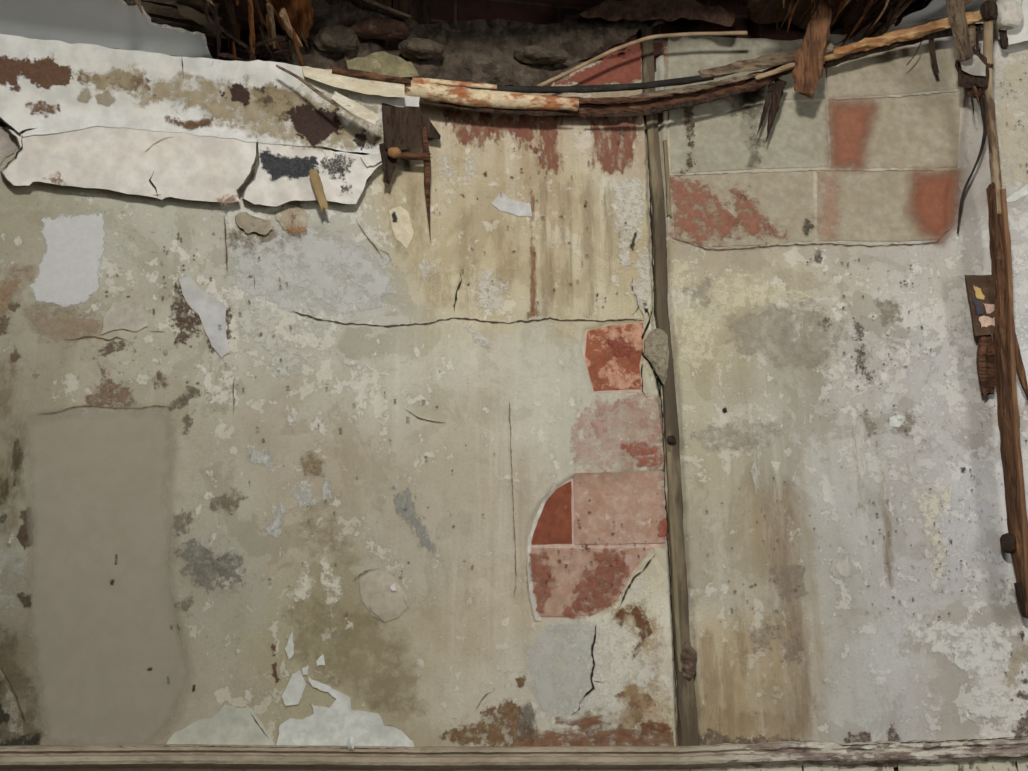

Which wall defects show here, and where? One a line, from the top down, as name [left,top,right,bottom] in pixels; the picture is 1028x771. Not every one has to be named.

peeling [176,4,224,33]
peeling [29,211,107,308]
crack [293,157,954,610]
flaking render [29,412,414,750]
flaking render [529,441,667,711]
peeling [0,670,25,736]
crack [572,626,599,715]
rust [513,662,674,746]
rust [615,603,657,657]